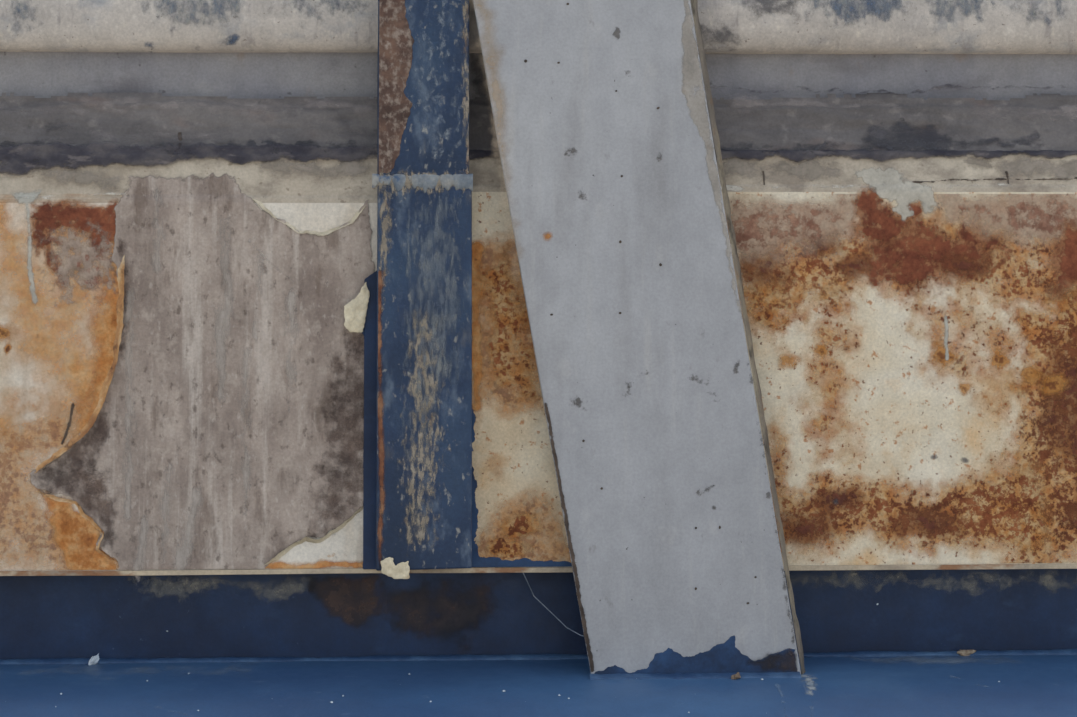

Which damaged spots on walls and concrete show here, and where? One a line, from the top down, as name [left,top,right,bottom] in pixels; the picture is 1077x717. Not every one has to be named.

corrosion [379,0,414,174]
corrosion [0,201,124,570]
peeling [30,173,375,576]
corrosion [472,234,542,414]
corrosion [725,189,1077,563]
peeling [381,557,410,579]
corrosion [478,493,571,562]
peeling [594,635,797,674]